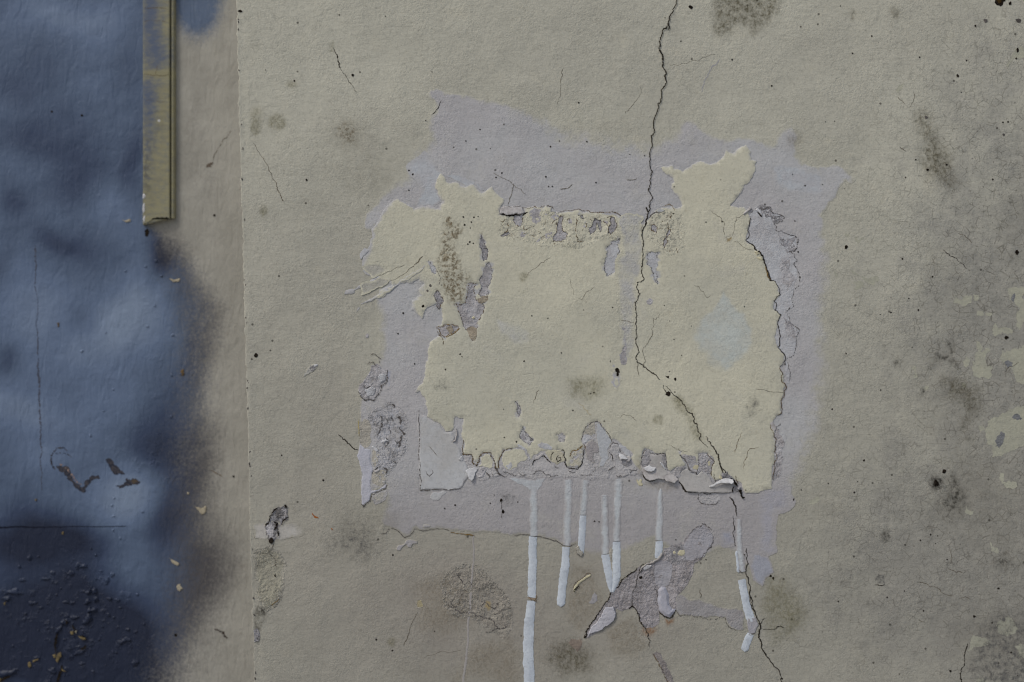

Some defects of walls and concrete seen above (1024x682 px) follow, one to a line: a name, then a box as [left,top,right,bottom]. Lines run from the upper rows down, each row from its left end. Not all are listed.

peeling [253,505,288,616]
peeling [358,235,774,682]
peeling [364,88,864,501]
crack [621,0,787,682]
peeling [954,287,1024,384]
peeling [978,406,1024,457]